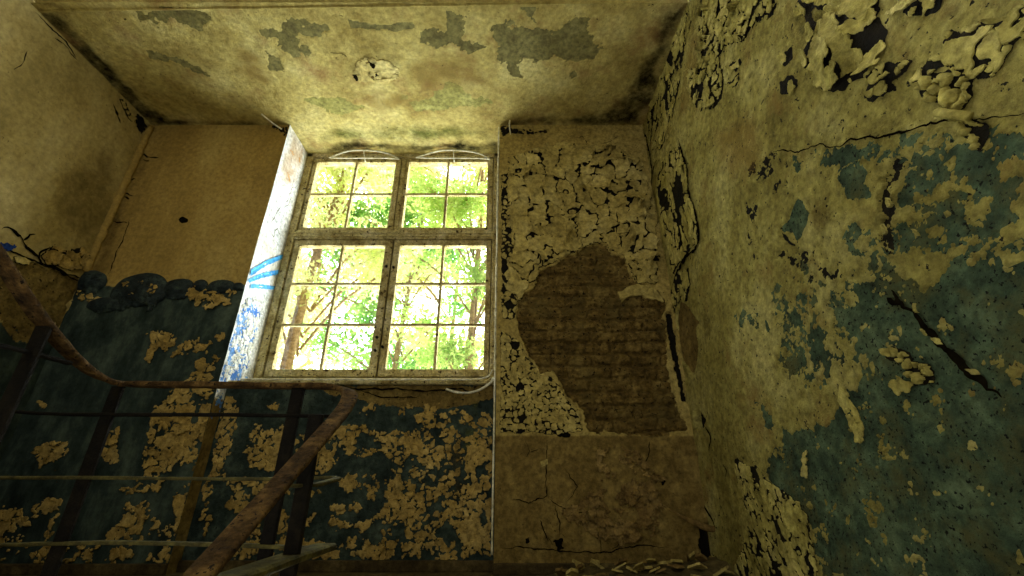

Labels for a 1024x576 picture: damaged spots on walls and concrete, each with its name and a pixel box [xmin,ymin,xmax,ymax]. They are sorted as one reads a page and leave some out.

leakage [45,15,187,124]
peeling [259,17,330,72]
peeling [348,7,604,79]
leakage [574,10,682,124]
peeling [777,0,1024,102]
crack [768,113,1024,154]
flaking render [500,0,777,437]
peeling [734,124,1024,576]
crack [887,290,1002,397]
peeling [62,285,284,564]
flaking render [302,385,496,560]
crack [343,330,664,554]